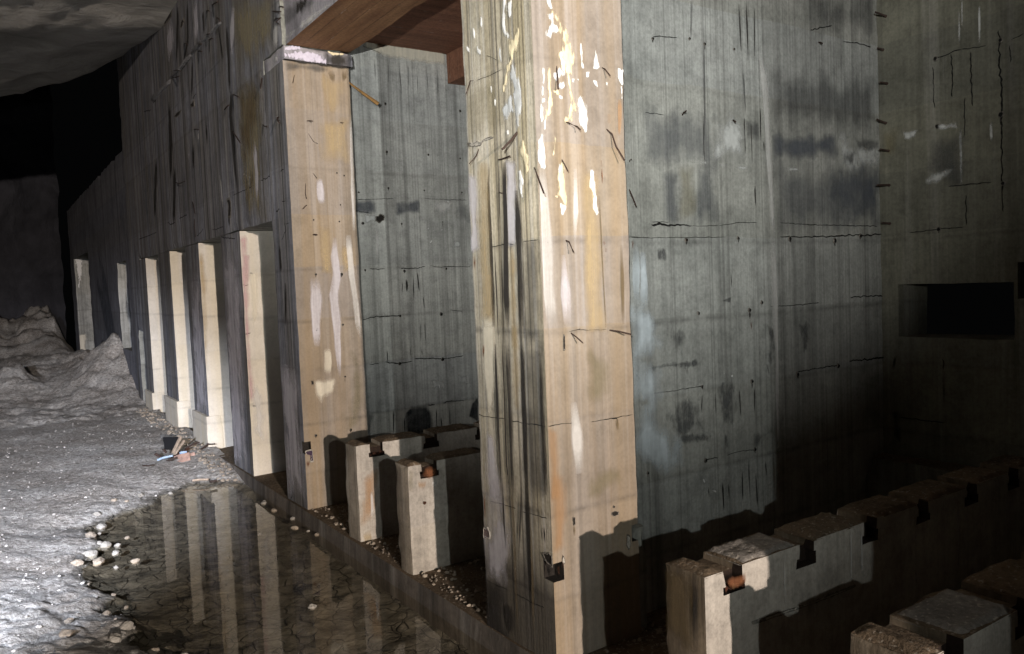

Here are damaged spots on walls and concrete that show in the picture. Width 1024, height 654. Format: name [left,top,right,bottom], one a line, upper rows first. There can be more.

peeling [491,0,521,135]
peeling [519,0,623,215]
damp [739,10,755,49]
damp [703,73,834,219]
crack [633,221,756,238]
crack [783,223,881,238]
damp [455,164,547,637]
damp [768,265,779,430]
rust [723,576,745,592]